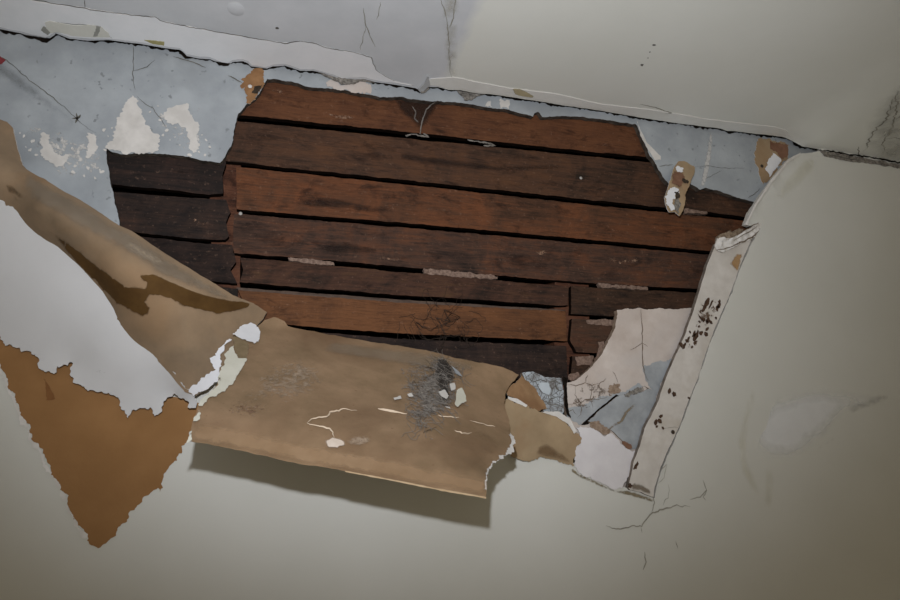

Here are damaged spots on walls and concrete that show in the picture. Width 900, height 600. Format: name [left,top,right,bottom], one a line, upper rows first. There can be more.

crack [0,0,462,131]
peeling [318,72,375,94]
peeling [19,96,211,179]
spalling [237,118,661,162]
crack [485,91,900,164]
spalling [242,212,709,255]
spalling [241,256,545,309]
spalling [289,326,545,345]
peeling [679,298,721,349]
flaking render [186,322,261,443]
peeling [439,366,466,409]
crack [606,464,707,531]